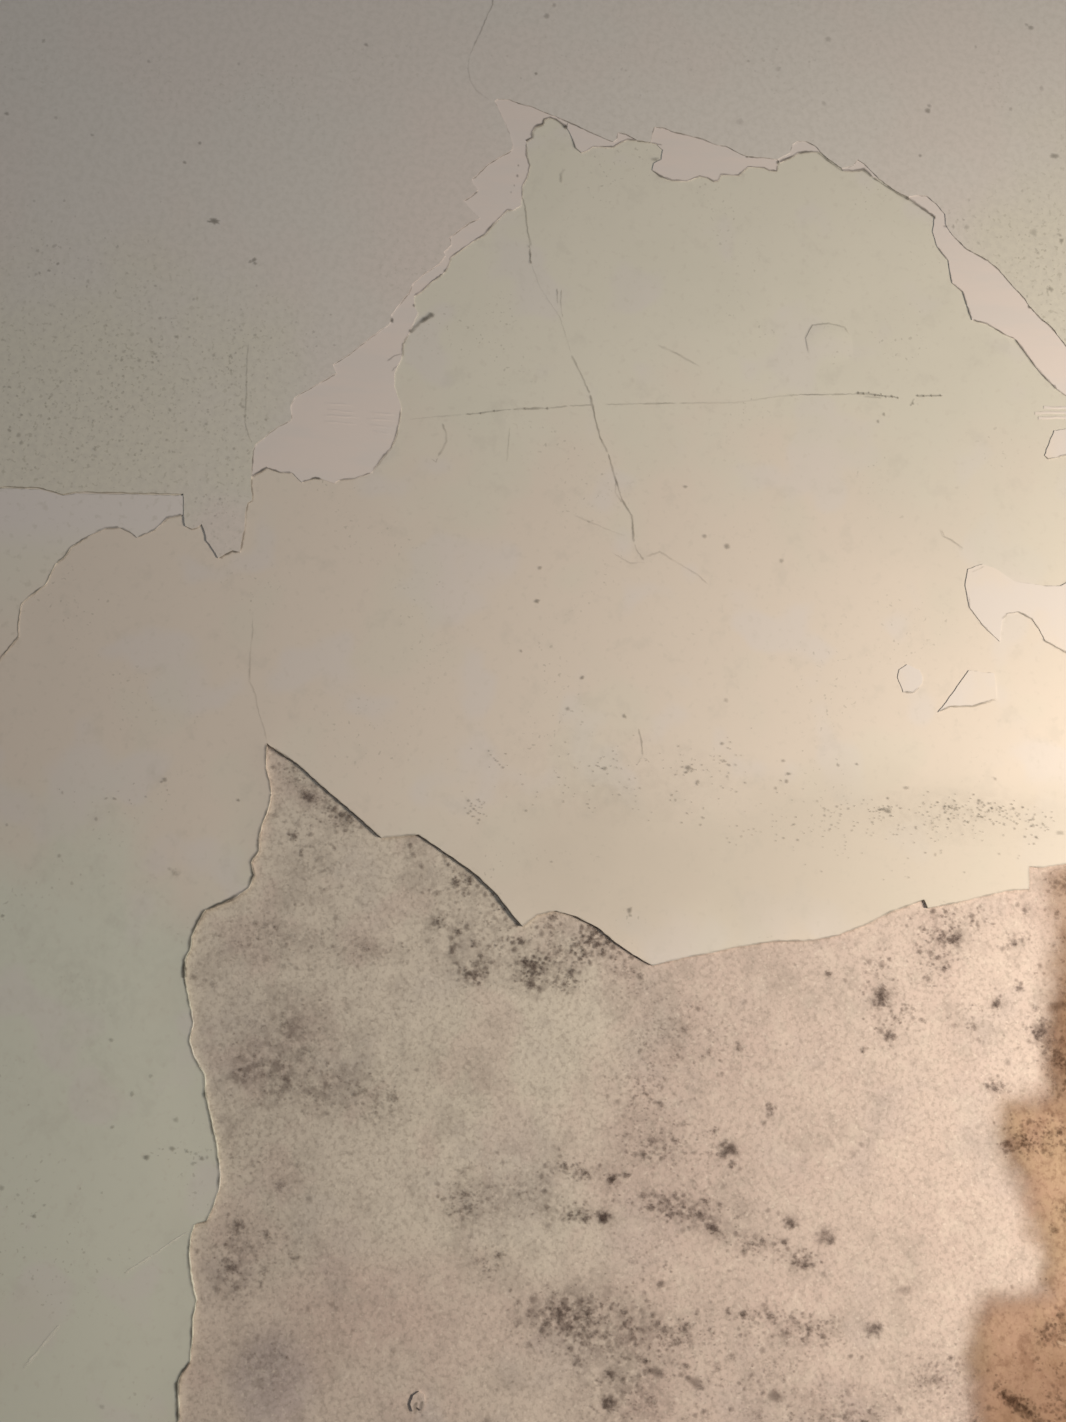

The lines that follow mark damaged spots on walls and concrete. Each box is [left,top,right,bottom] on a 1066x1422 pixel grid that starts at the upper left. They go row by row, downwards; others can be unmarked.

peeling [251,99,568,483]
peeling [650,127,778,182]
peeling [908,195,1066,396]
flaking render [176,744,1066,1422]
damp [970,869,1066,1422]